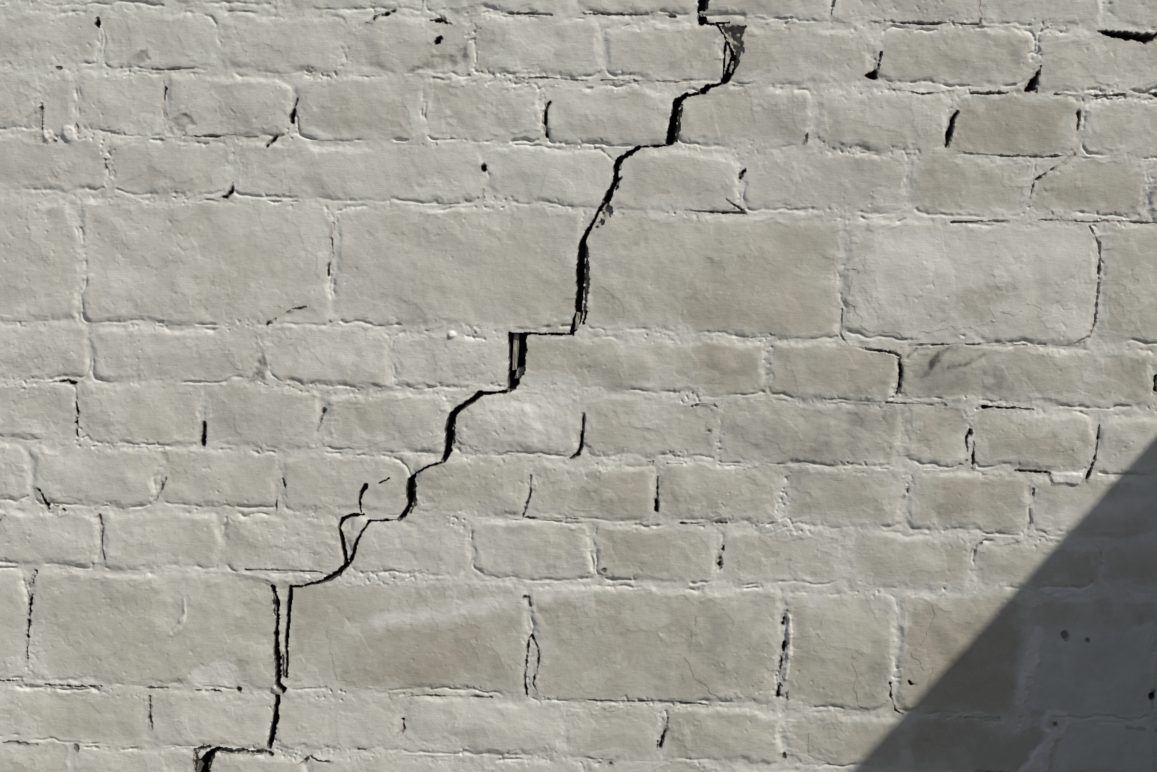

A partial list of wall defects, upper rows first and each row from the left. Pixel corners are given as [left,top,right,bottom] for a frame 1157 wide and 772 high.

crack [150,67,194,121]
crack [192,0,747,772]
crack [153,476,167,502]
crack [0,678,102,689]
crack [146,685,242,694]